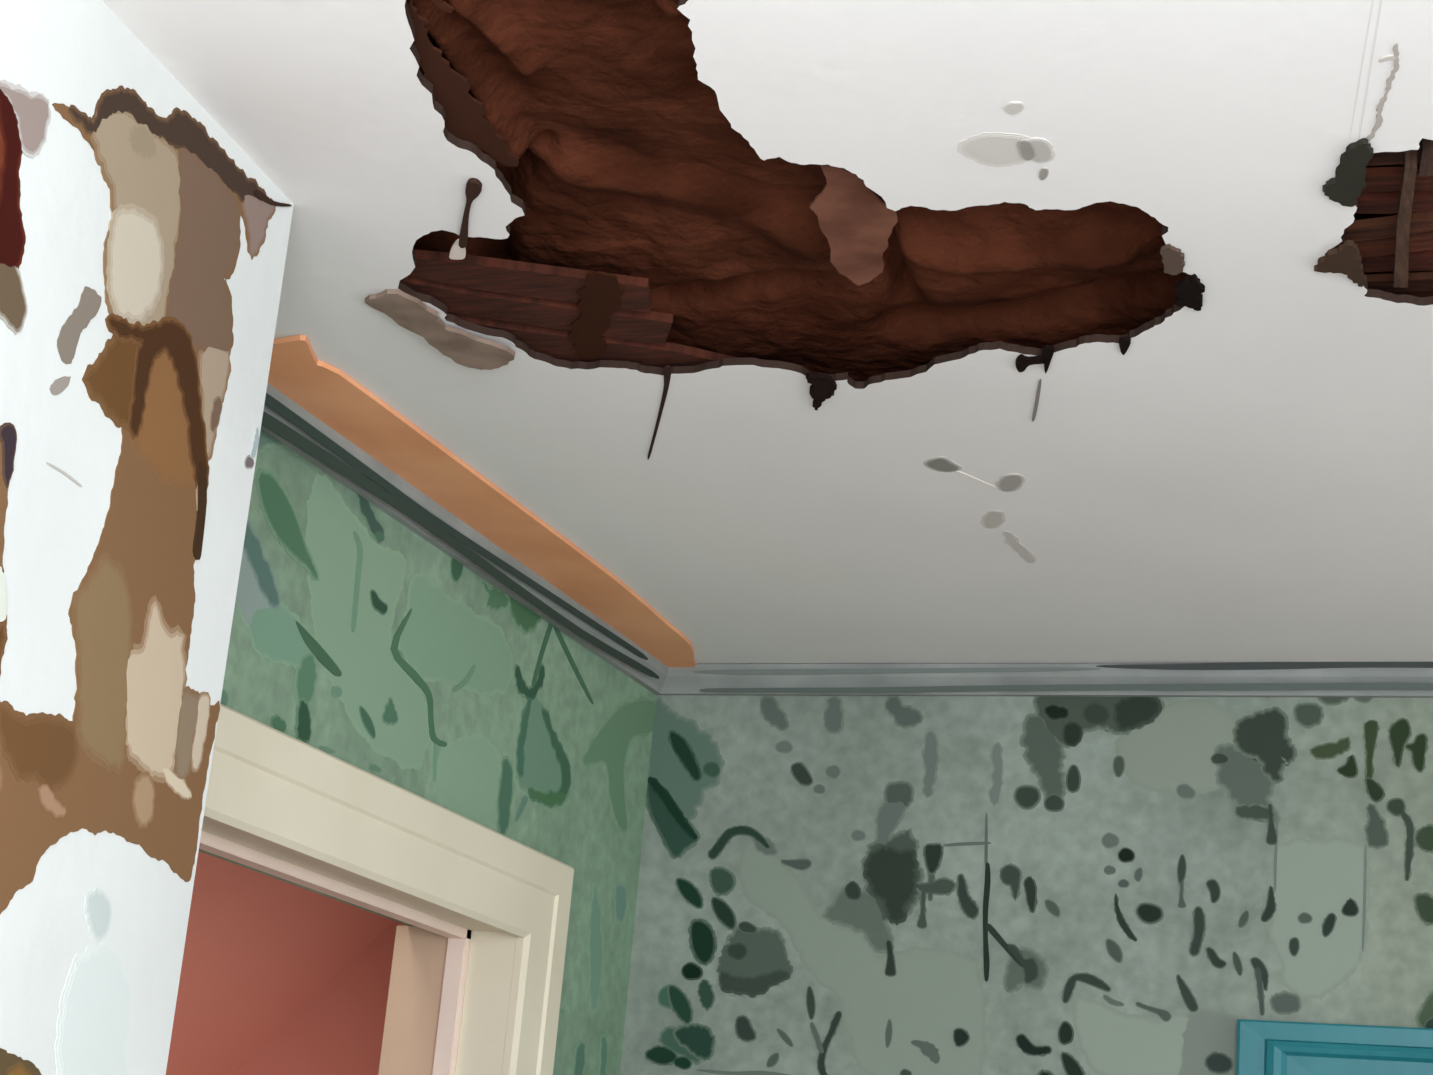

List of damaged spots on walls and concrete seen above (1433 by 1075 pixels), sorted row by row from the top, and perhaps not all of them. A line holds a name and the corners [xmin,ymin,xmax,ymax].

peeling [449,239,466,260]
peeling [0,80,276,914]
mould [648,696,725,820]
leakage [759,696,793,753]
mould [1019,696,1165,800]
leakage [1214,697,1373,826]
leakage [821,696,940,954]
leakage [1364,803,1390,849]
mould [658,921,793,1070]
leakage [1003,946,1049,993]
leakage [1178,1008,1238,1075]
leakage [1269,990,1302,1015]